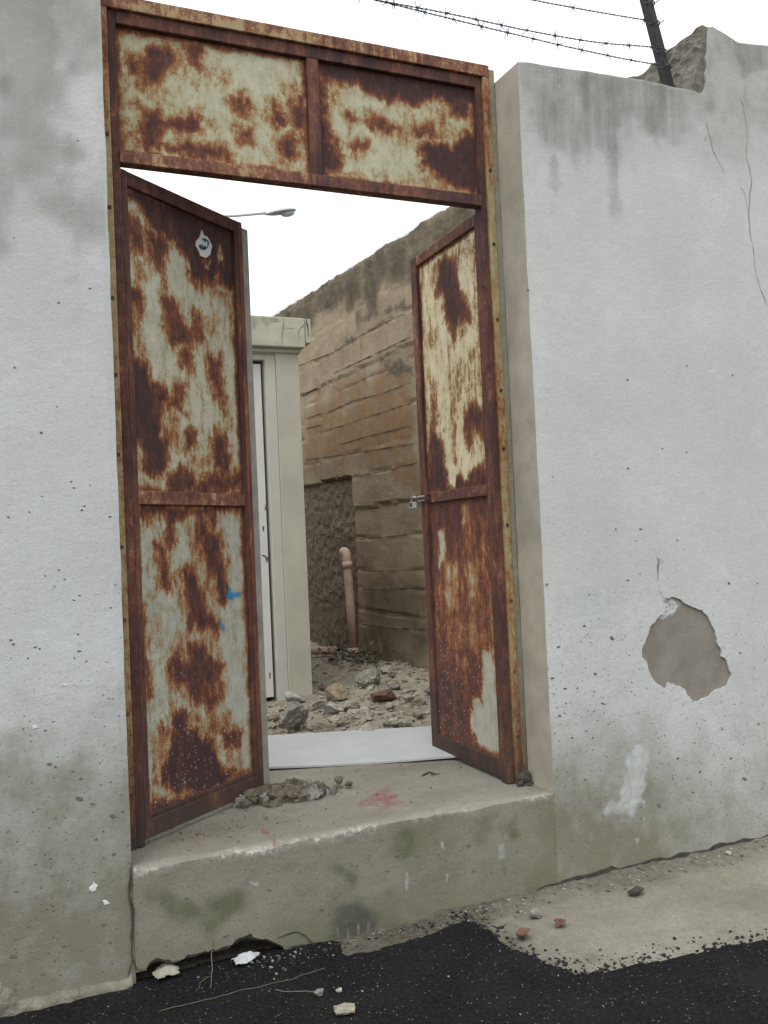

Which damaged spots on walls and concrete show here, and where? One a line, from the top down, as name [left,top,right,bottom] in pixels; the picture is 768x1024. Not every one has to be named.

spalling [627,25,709,93]
crack [740,98,766,301]
flaking render [642,597,730,701]
damp [619,744,648,812]
spalling [0,926,313,1018]